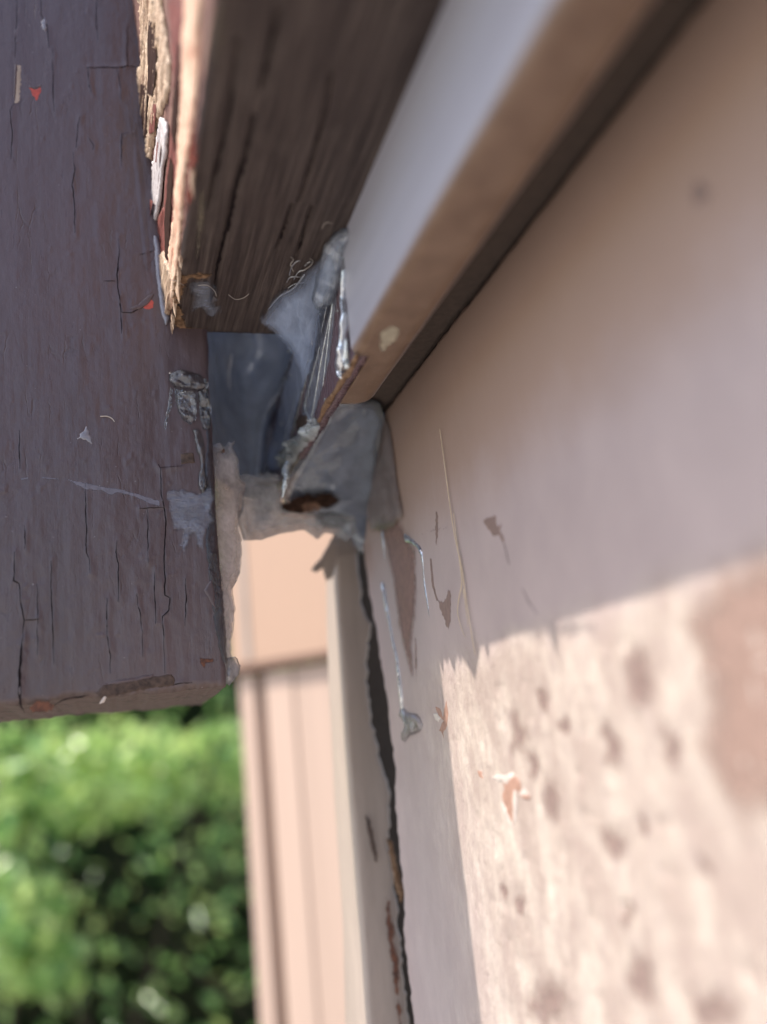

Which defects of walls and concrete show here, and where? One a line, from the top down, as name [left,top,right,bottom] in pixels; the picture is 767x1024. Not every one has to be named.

crack [71,116,94,225]
peeling [130,0,196,325]
crack [210,40,254,291]
crack [278,82,330,253]
crack [110,238,152,332]
crack [13,527,54,714]
crack [83,483,91,570]
crack [106,464,192,685]
peeling [438,591,451,628]
peeling [484,516,504,542]
peeling [477,770,530,828]
corrosion [386,901,402,1024]